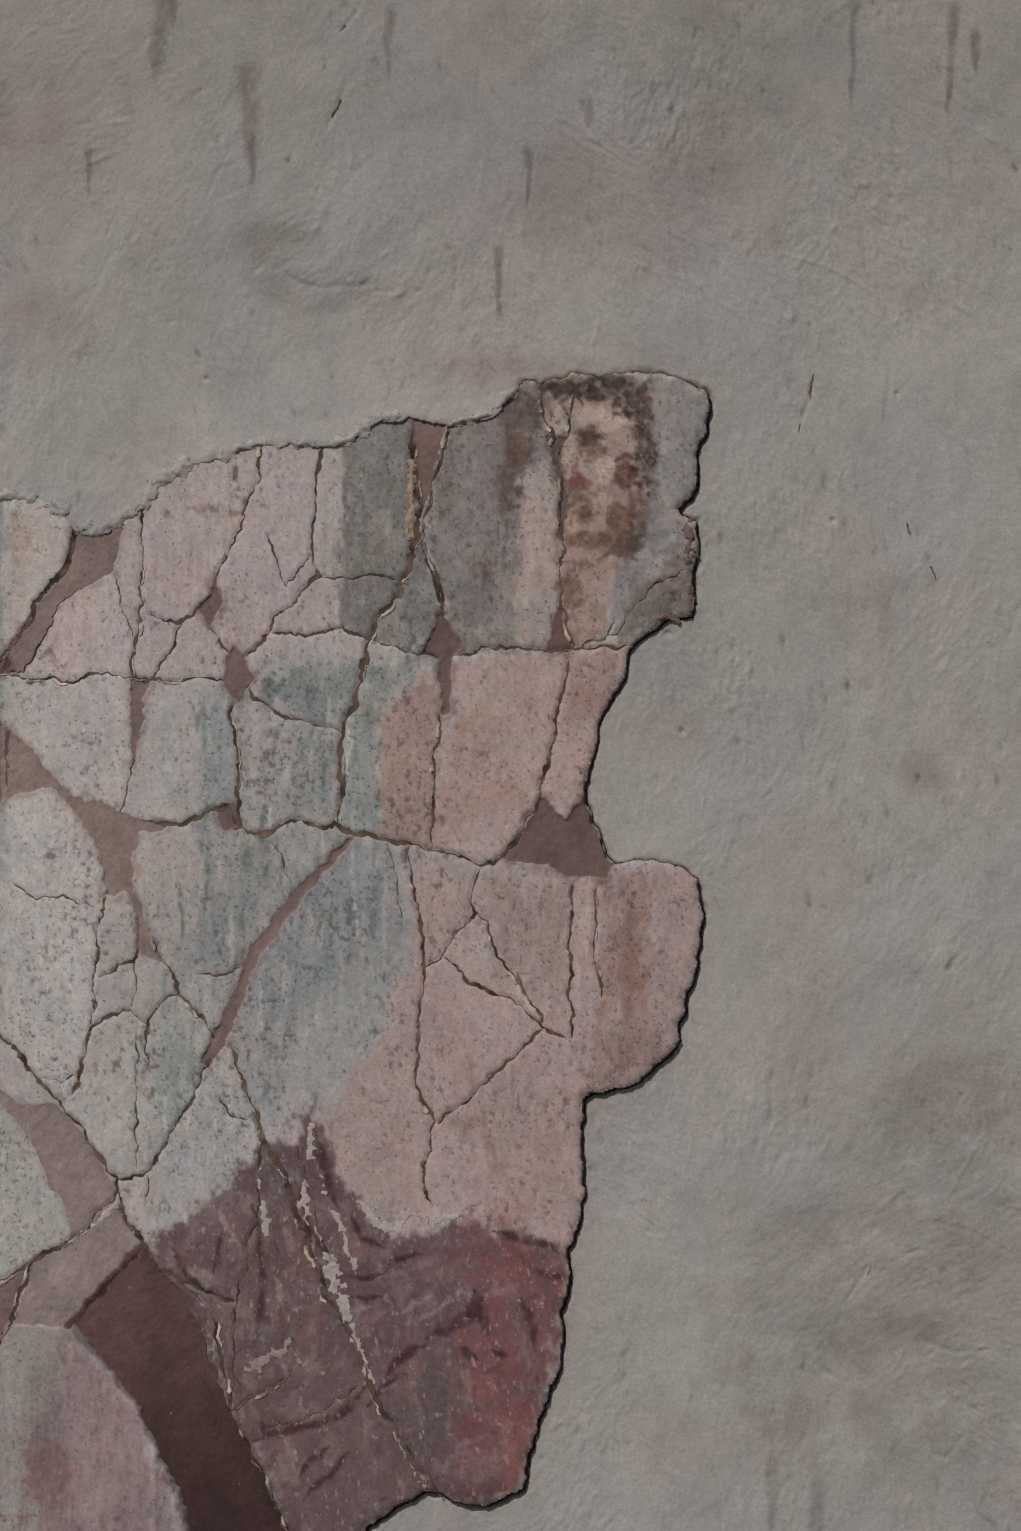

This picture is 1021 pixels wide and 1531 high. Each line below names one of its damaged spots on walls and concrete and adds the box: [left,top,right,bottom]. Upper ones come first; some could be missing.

spalling [404,459,417,540]
spalling [676,517,699,565]
crack [0,386,682,1204]
crack [0,882,442,1531]
peeling [257,1167,272,1237]
peeling [297,1123,375,1385]
peeling [355,1200,460,1234]
peeling [244,1337,302,1380]